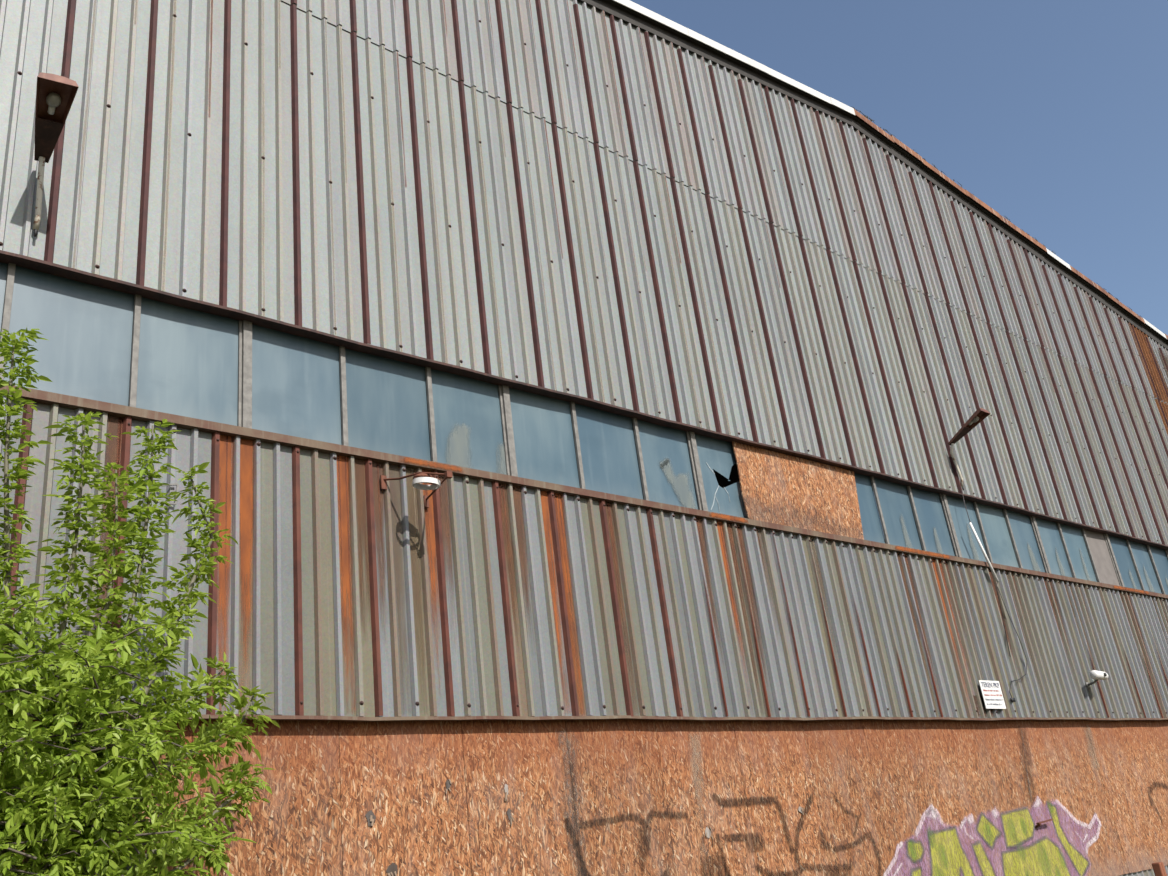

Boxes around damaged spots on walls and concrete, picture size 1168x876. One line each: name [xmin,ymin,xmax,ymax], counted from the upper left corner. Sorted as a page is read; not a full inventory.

corrosion [1073,303,1168,435]
corrosion [217,435,254,675]
corrosion [336,455,462,673]
corrosion [498,483,528,615]
corrosion [540,490,584,712]
corrosion [695,512,773,685]
corrosion [895,546,993,716]
corrosion [1114,585,1168,696]